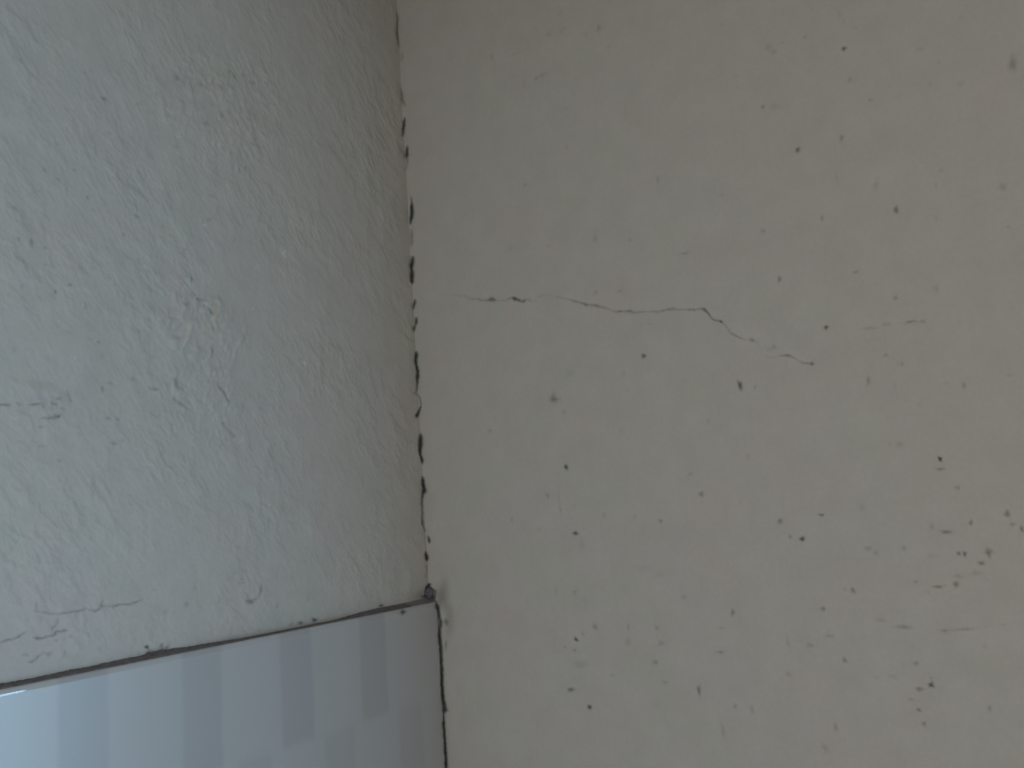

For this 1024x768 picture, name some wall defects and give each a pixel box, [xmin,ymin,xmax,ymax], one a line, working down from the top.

crack [410,258,419,384]
crack [416,409,430,561]